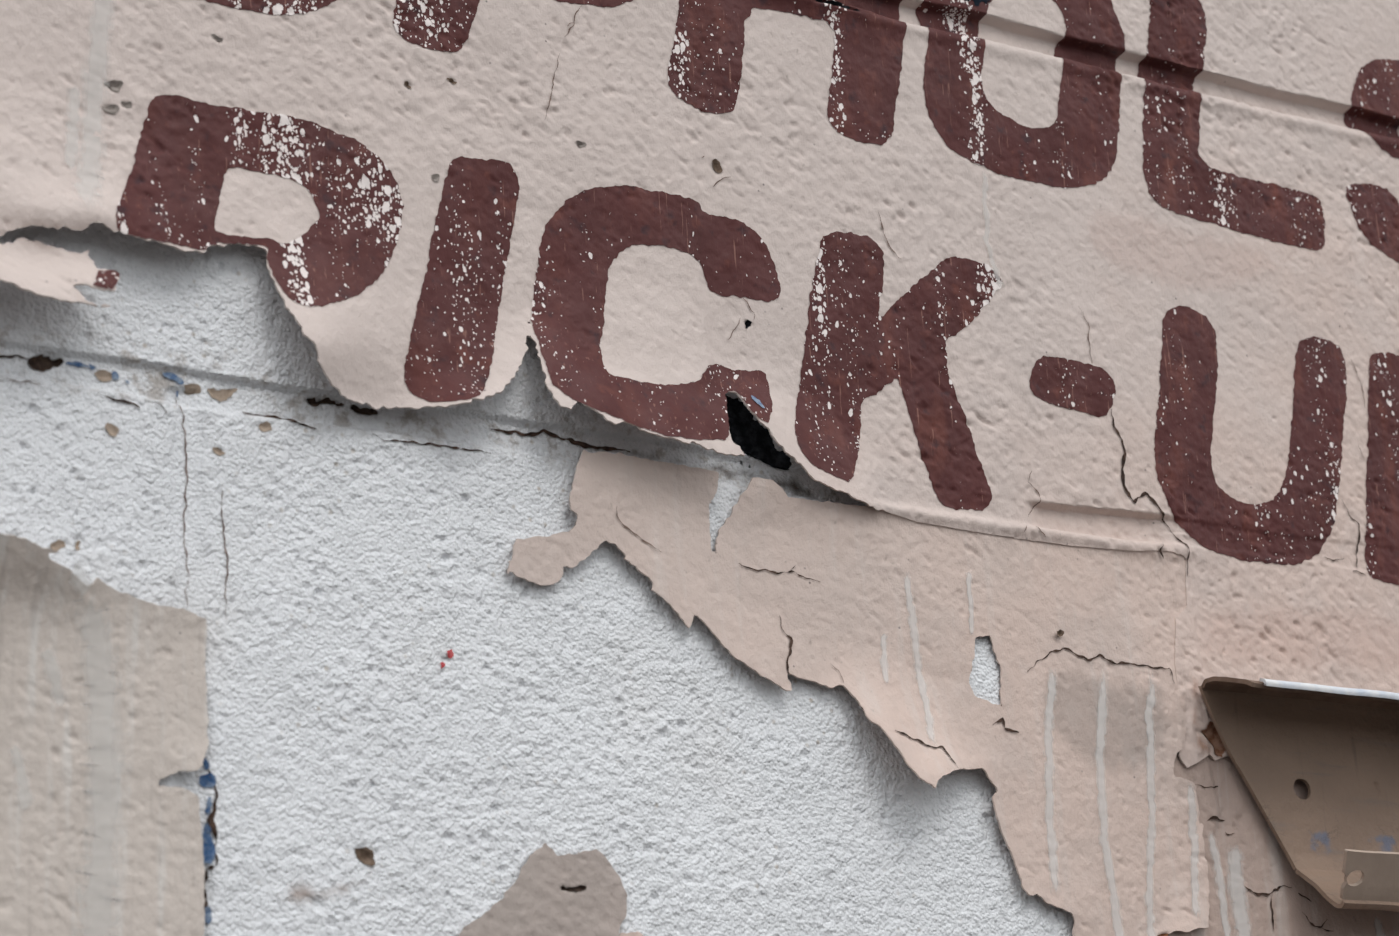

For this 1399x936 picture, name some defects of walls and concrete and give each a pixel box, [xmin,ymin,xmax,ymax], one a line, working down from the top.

crack [0,354,45,385]
crack [243,412,317,429]
crack [373,429,630,454]
crack [1111,409,1190,576]
peeling [0,166,1226,936]
crack [1027,647,1175,684]